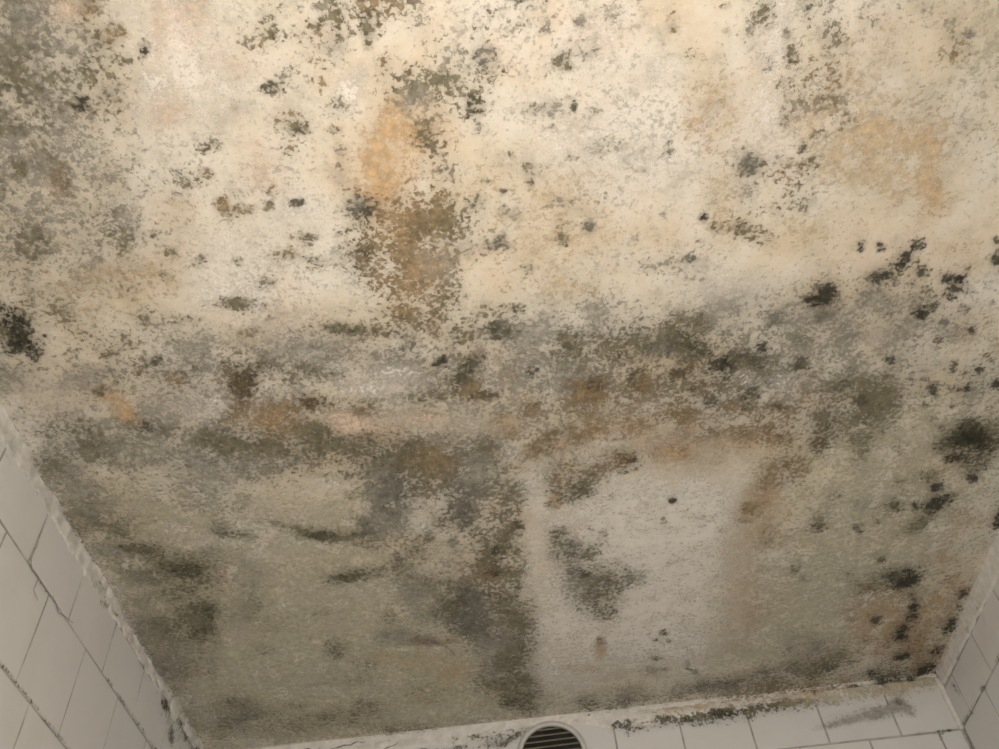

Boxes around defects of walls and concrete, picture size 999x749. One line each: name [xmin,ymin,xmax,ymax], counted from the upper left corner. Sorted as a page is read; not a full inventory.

damp [896,0,999,109]
damp [264,106,310,156]
damp [327,23,499,183]
damp [503,0,855,247]
damp [157,163,214,207]
damp [211,191,253,222]
damp [639,240,705,285]
damp [825,698,914,728]